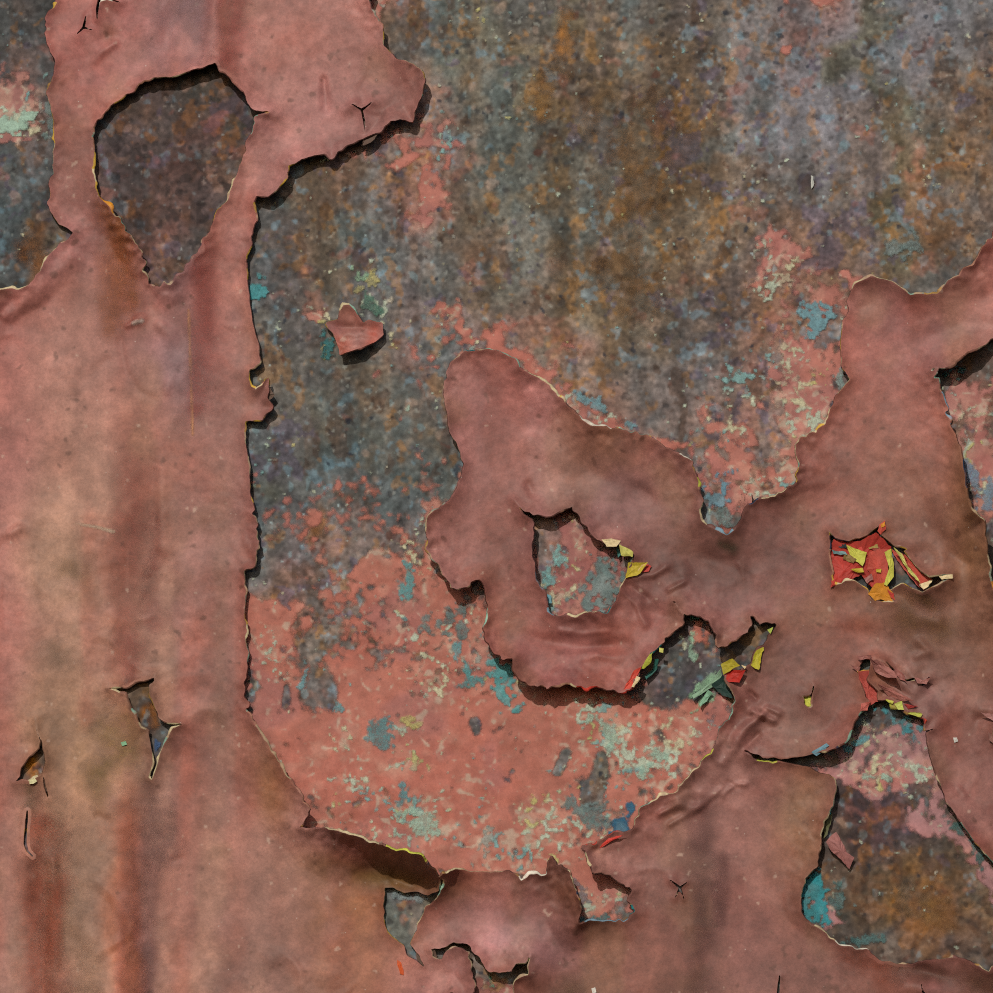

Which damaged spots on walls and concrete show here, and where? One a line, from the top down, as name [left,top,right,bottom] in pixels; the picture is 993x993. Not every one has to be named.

peeling [0,0,73,290]
peeling [91,63,269,287]
peeling [244,0,993,993]
peeling [110,678,182,780]